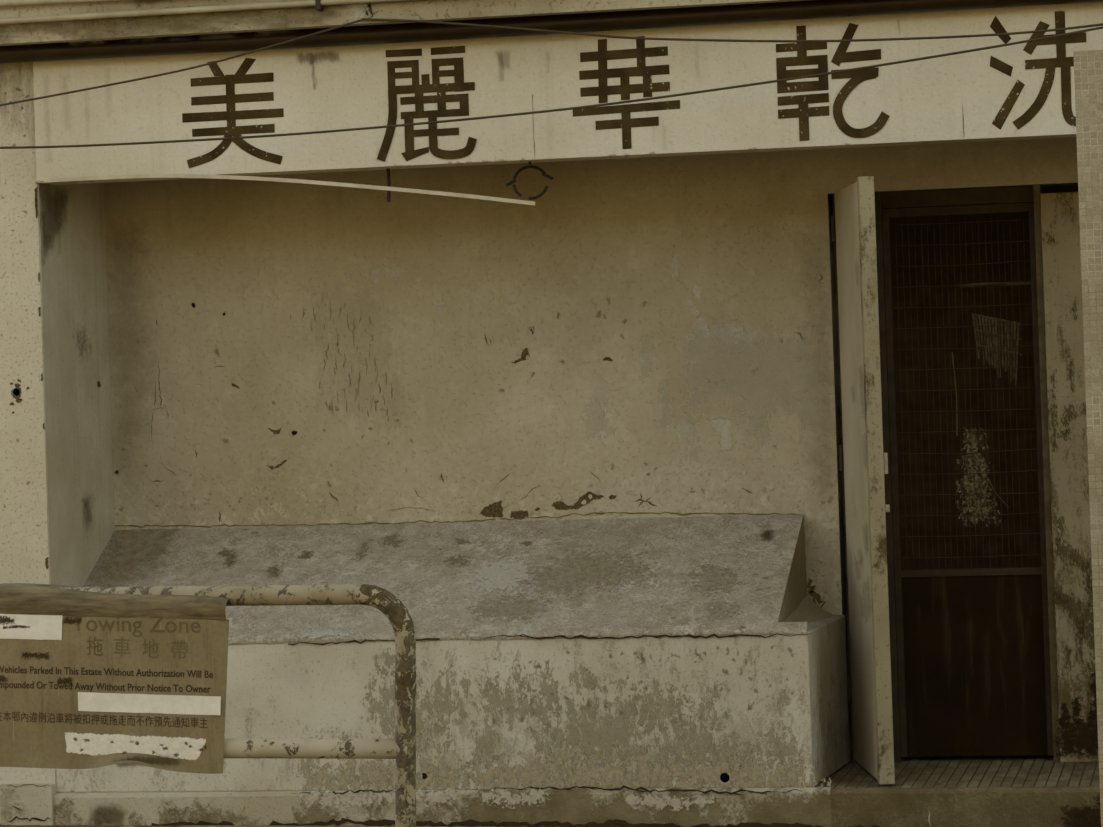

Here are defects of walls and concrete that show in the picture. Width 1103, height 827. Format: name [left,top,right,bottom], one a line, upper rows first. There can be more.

crack [115,473,804,528]
spalling [479,490,616,522]
crack [807,578,826,608]
crack [483,632,812,640]
peeling [362,648,395,739]
peeling [416,660,832,811]
leakage [1055,673,1098,758]